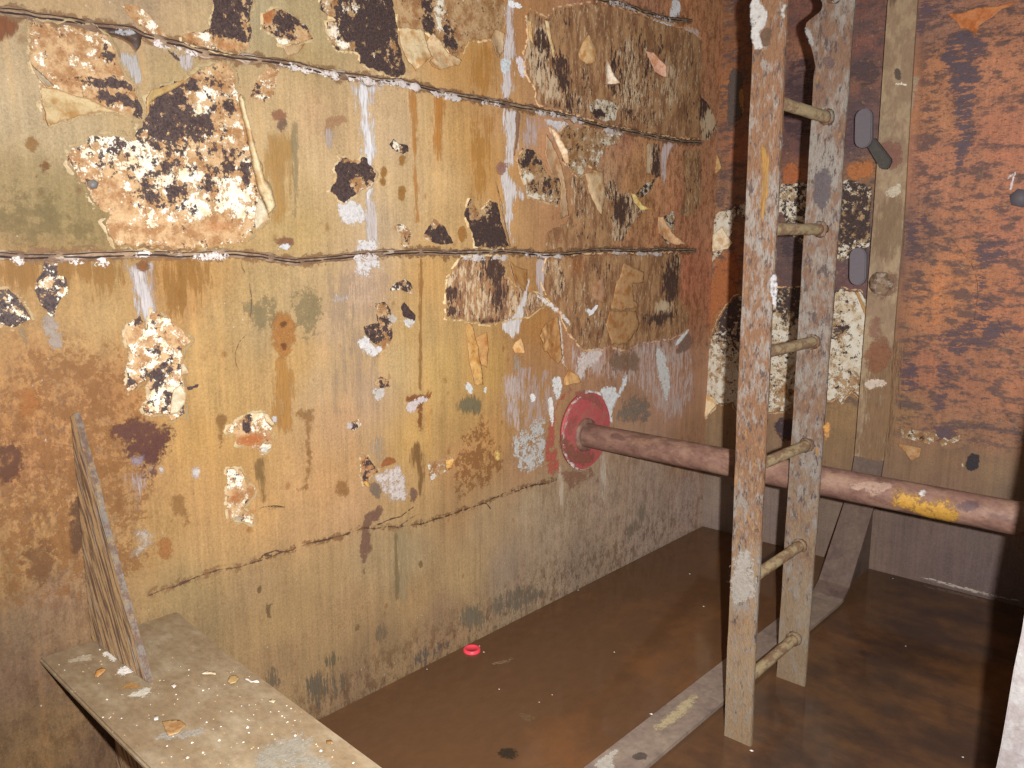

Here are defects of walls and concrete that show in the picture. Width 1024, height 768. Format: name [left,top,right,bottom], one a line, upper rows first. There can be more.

peeling [26,0,507,254]
damp [279,62,461,165]
damp [482,0,584,245]
damp [338,182,380,279]
peeling [443,0,746,387]
peeling [122,307,199,423]
rust [271,312,296,431]
damp [502,253,693,474]
peeling [705,293,742,419]
rust [0,445,22,482]
rust [110,418,171,478]
crack [147,477,557,596]